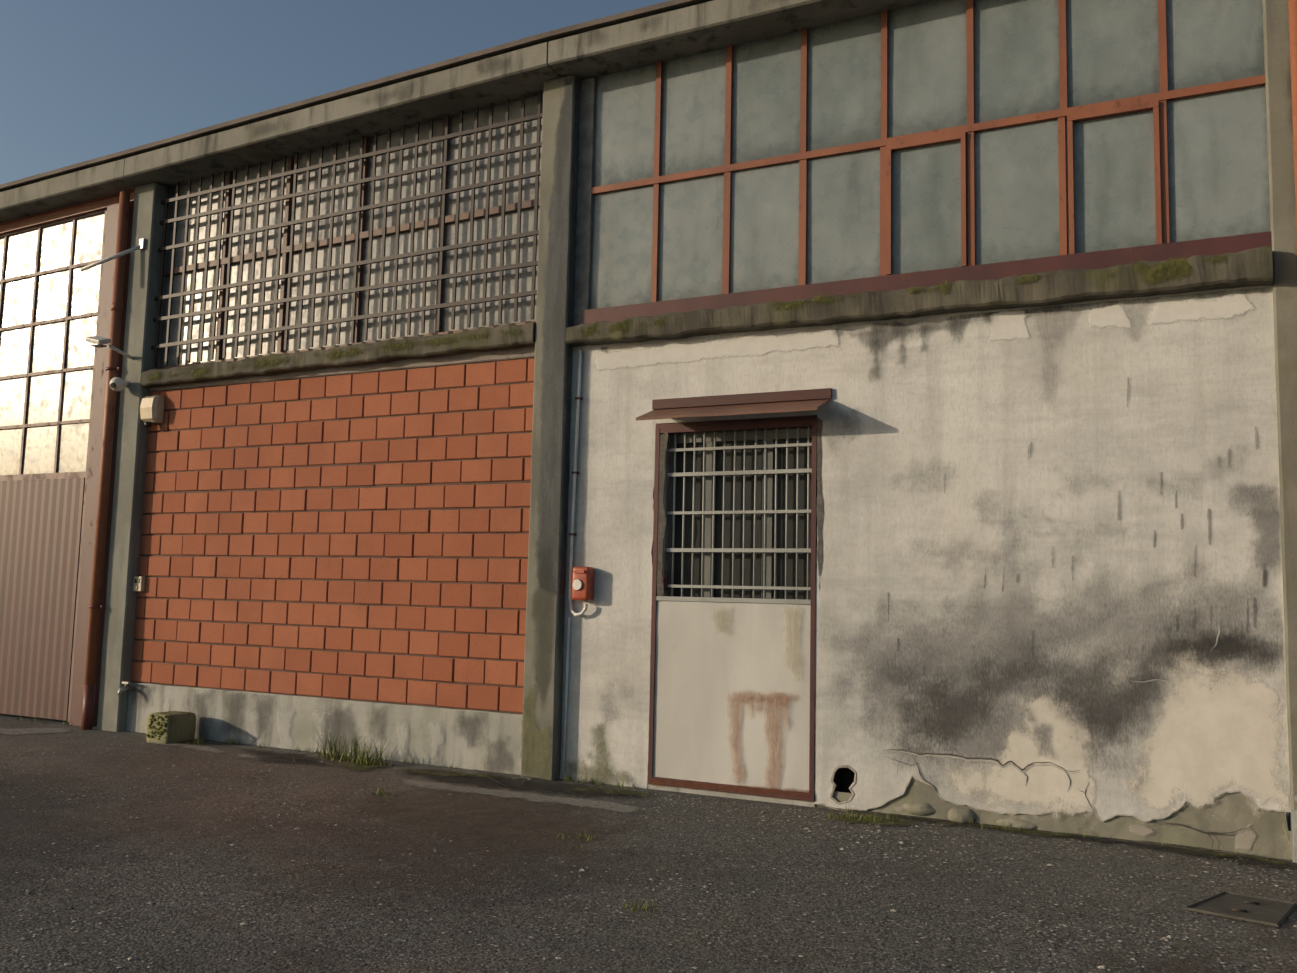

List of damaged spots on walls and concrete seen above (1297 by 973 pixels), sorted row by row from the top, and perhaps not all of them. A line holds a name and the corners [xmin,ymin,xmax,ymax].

water stain [1167,631,1273,664]
corrosion [650,693,810,797]
crack [883,749,1091,806]
peeling [815,635,1297,863]